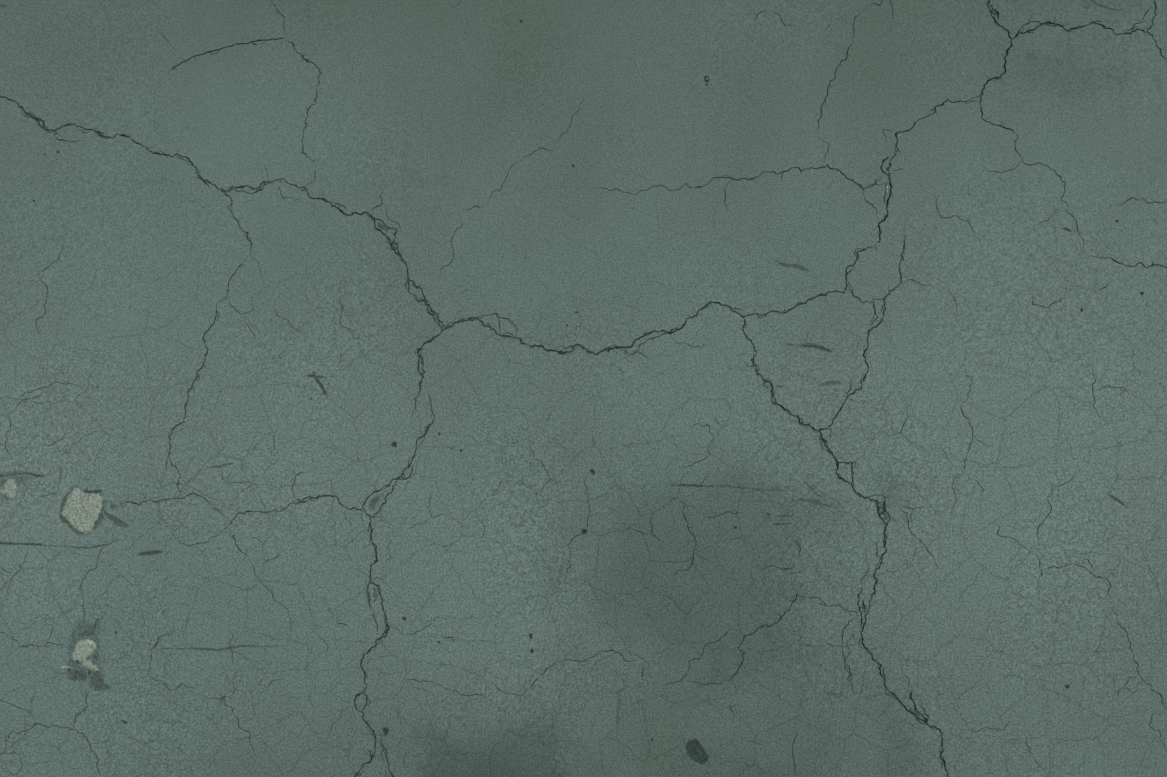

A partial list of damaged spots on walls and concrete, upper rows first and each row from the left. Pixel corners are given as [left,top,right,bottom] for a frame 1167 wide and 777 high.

crack [168,37,324,165]
crack [676,0,1166,248]
crack [1090,255,1167,270]
crack [0,96,949,777]
crack [952,370,993,507]
crack [1092,370,1126,419]
peeling [60,629,111,691]
crack [997,475,1166,737]
crack [966,723,1044,770]